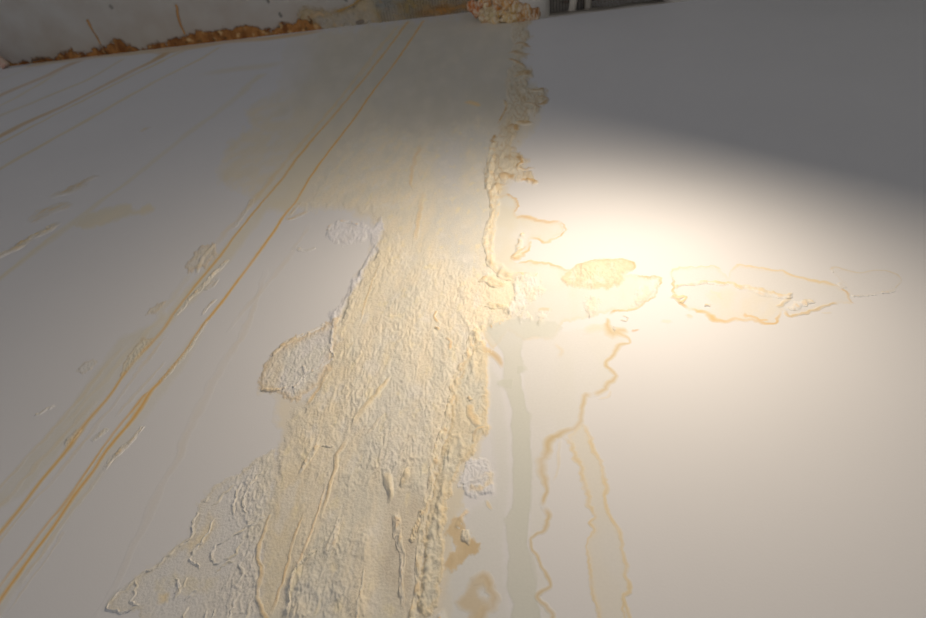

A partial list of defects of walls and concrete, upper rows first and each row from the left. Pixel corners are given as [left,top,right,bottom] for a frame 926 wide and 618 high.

corrosion [0,5,426,618]
leakage [214,0,902,618]